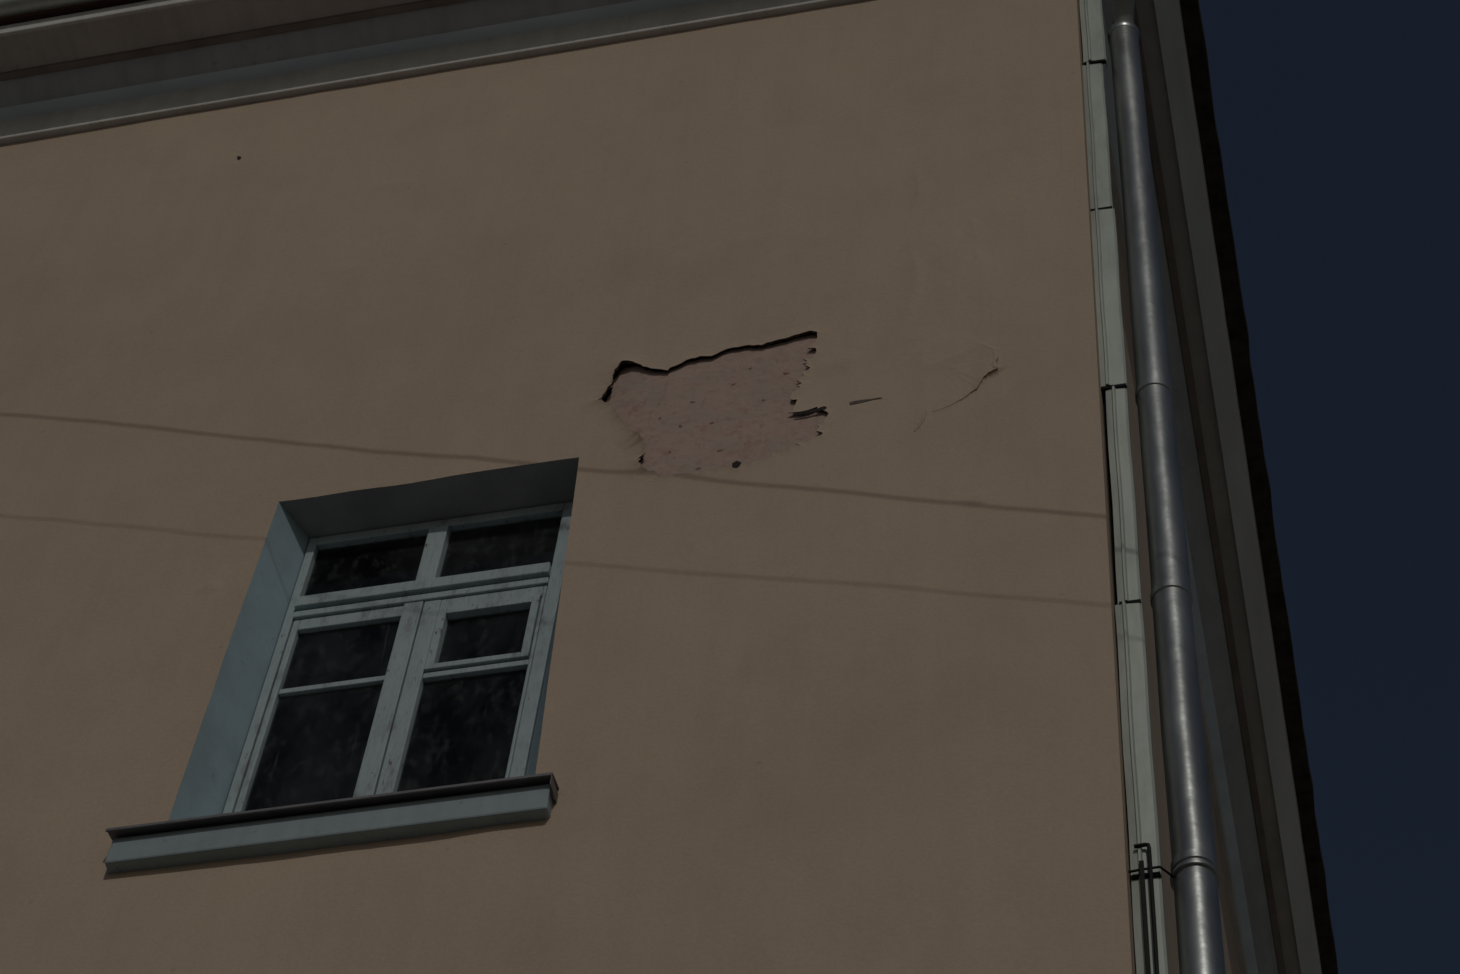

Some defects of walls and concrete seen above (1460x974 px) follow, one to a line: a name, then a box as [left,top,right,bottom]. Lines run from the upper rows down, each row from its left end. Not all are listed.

peeling [578,323,848,489]